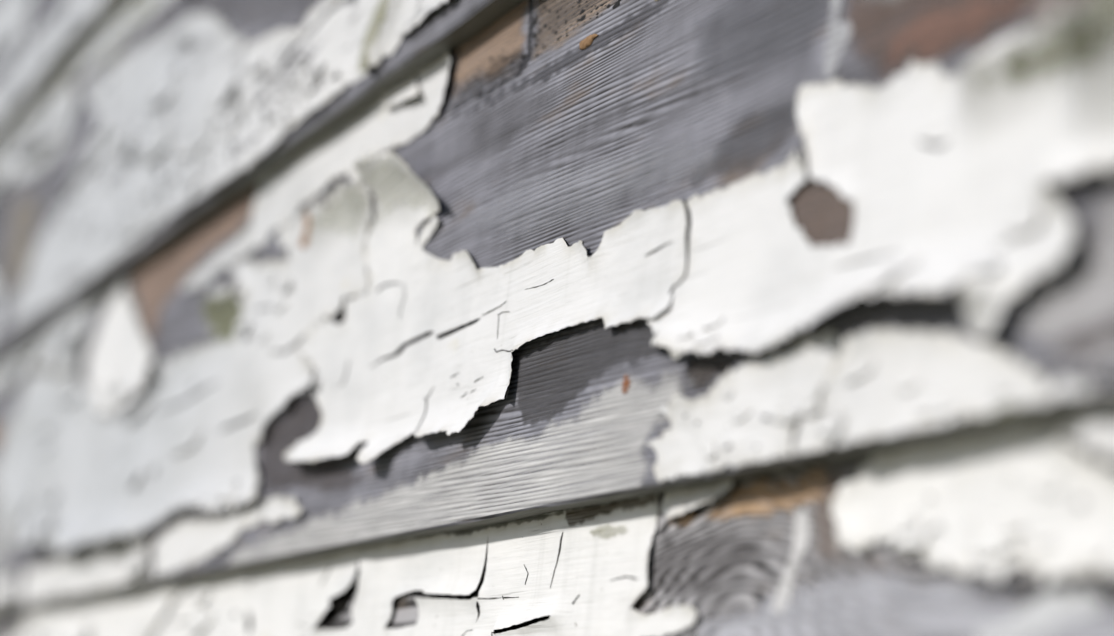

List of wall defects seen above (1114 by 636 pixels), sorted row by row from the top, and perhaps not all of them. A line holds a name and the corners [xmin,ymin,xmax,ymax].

peeling [0,0,687,610]
crack [645,199,691,295]
peeling [647,0,1114,361]
peeling [16,479,736,636]
crack [387,532,580,636]